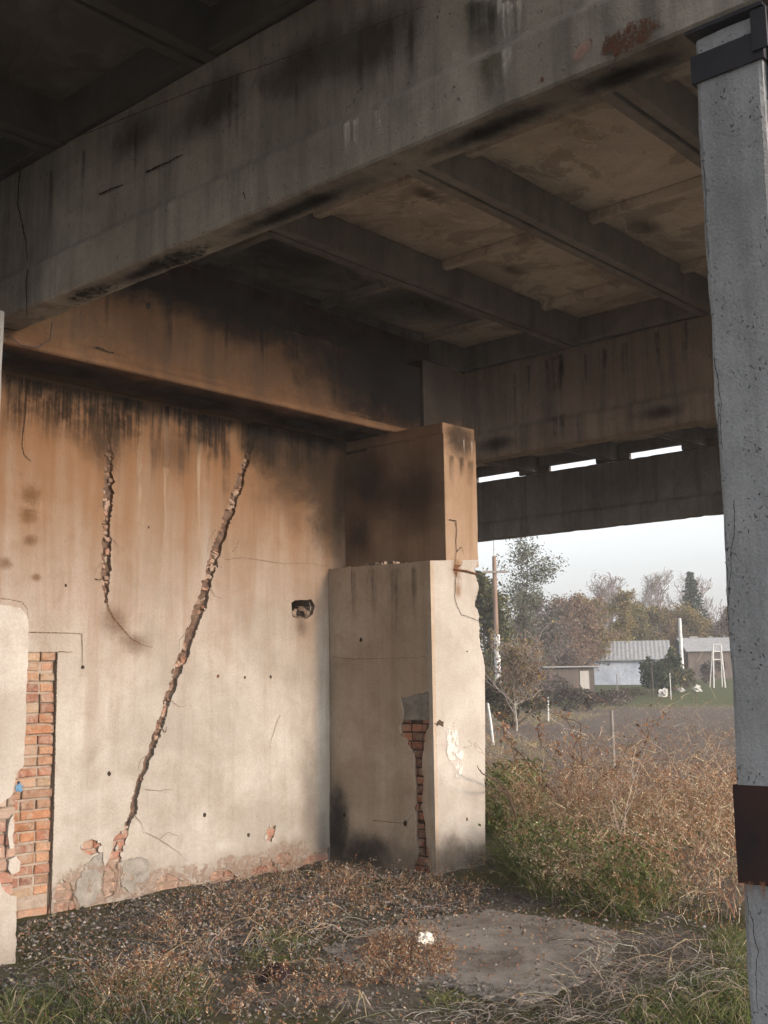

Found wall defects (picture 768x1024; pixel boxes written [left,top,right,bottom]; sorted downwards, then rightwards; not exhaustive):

corrosion [602,17,660,57]
leakage [447,109,542,150]
leakage [241,193,339,233]
leakage [6,375,231,445]
crack [94,412,149,647]
crack [102,423,368,900]
spalling [401,692,430,874]
flaking render [0,772,20,895]
spalling [47,876,76,914]
spalling [80,825,128,897]
spalling [208,824,293,883]
leakage [329,790,383,866]